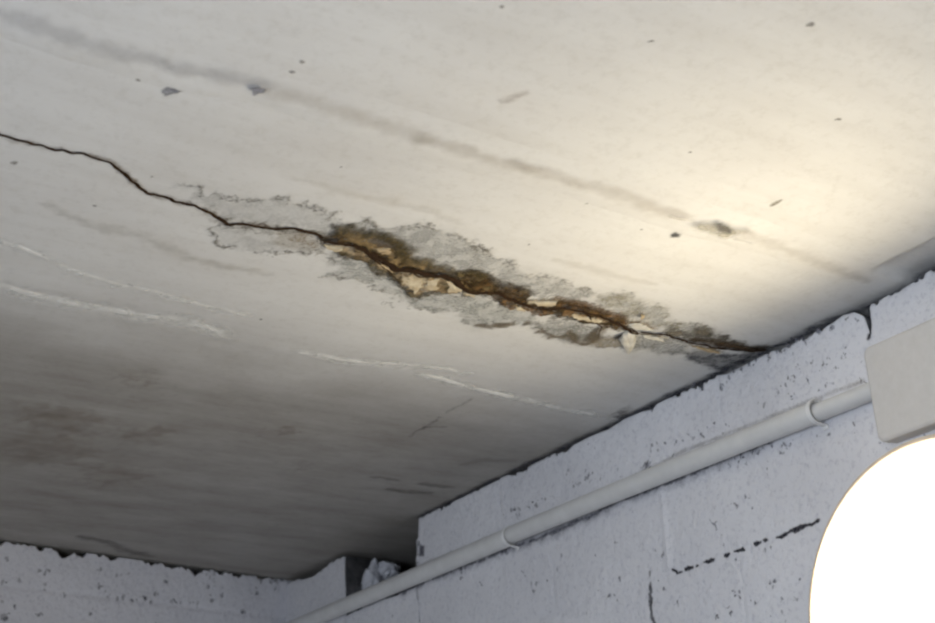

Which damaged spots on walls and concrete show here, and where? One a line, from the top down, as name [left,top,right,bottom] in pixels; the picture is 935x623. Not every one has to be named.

crack [0,134,766,352]
spalling [320,225,668,355]
crack [672,519,820,574]